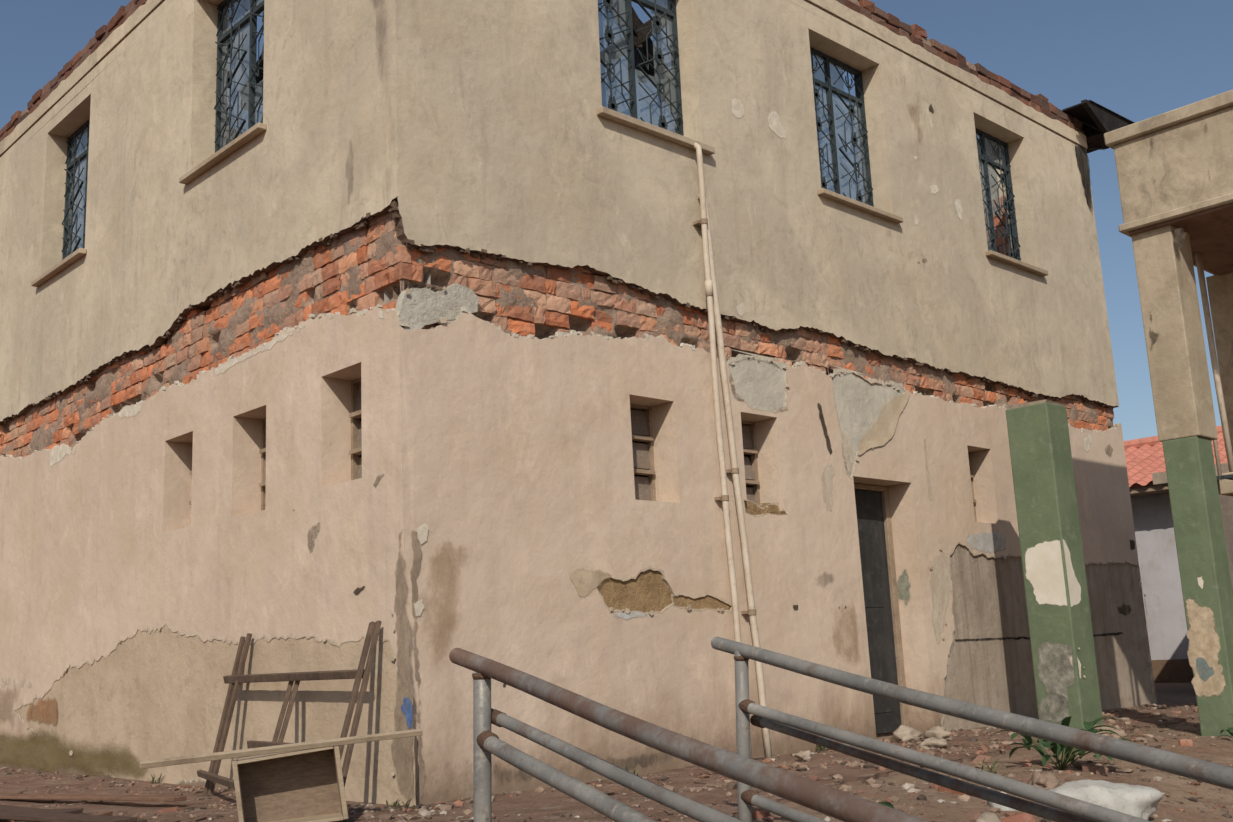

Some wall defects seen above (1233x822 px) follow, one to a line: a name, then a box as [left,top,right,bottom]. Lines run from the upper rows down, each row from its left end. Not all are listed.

flaking render [0,195,1118,479]
crack [817,403,832,455]
leakage [0,733,144,776]
flaking render [14,523,429,806]
flaking render [570,566,732,619]
flaking render [941,714,989,731]
flaking render [943,532,1156,723]
flaking render [1186,577,1226,697]